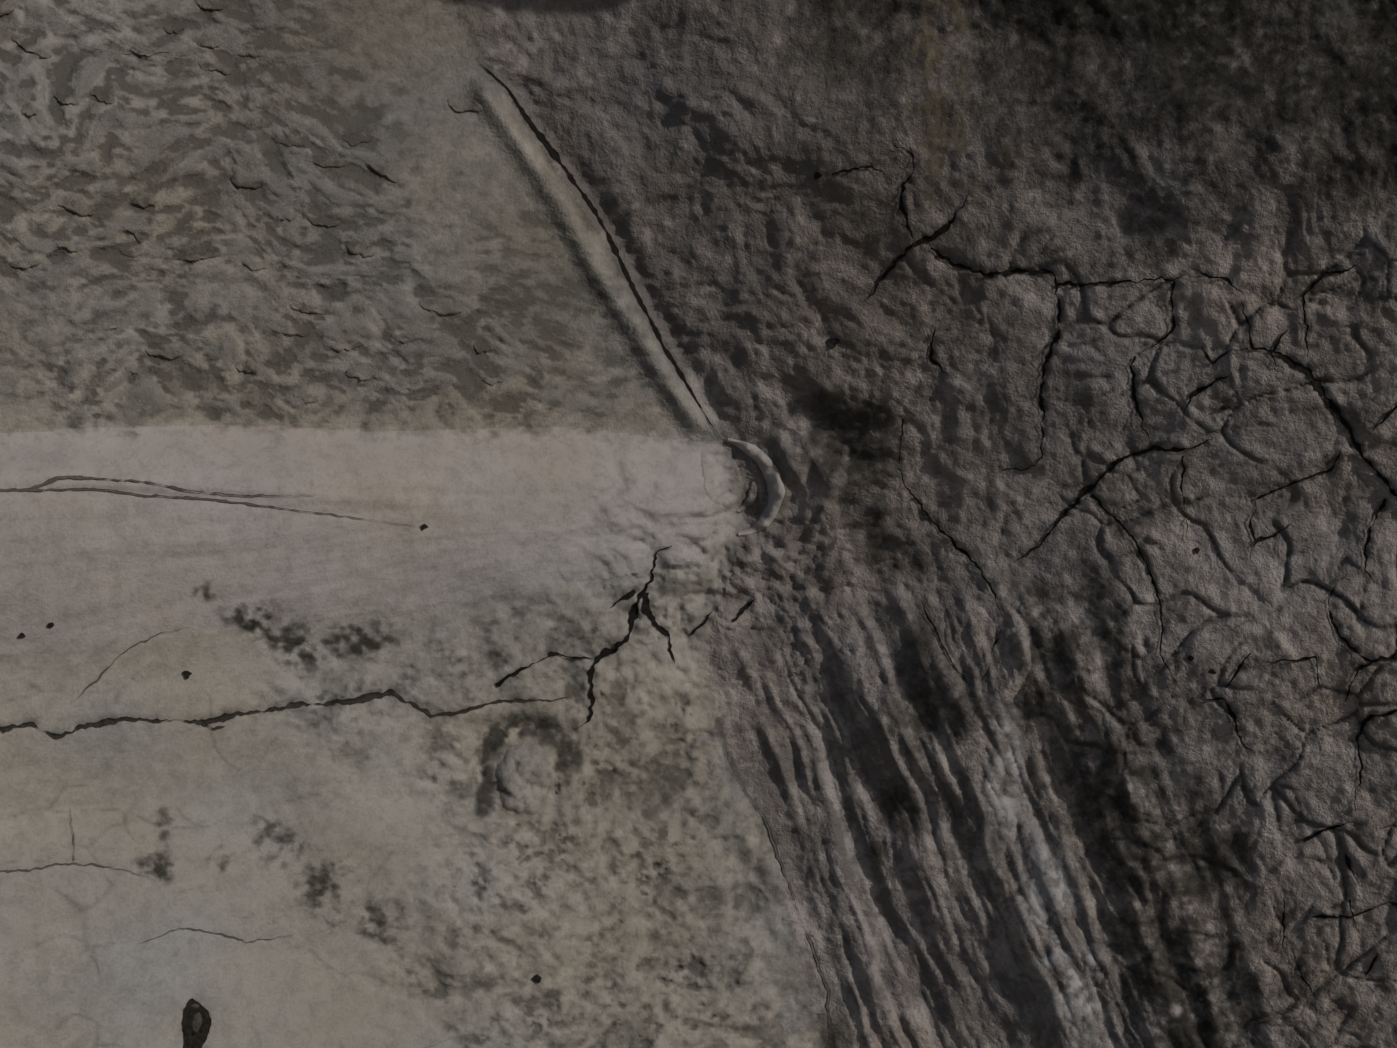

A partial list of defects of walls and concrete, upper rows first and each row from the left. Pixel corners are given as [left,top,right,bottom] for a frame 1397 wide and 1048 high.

crack [480,64,722,440]
crack [0,475,415,526]
crack [0,545,755,739]
crack [831,139,1397,1008]
spalling [182,998,212,1048]